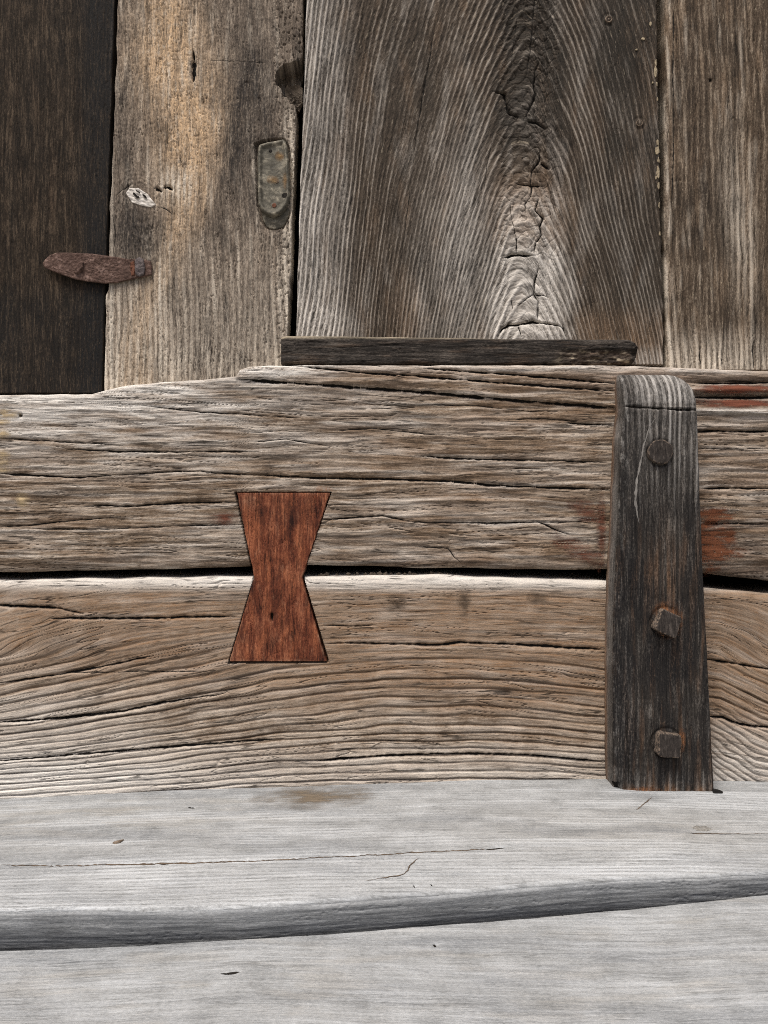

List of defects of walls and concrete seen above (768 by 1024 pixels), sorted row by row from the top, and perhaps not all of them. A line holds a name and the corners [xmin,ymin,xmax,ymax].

crack [495,1,549,130]
crack [497,155,566,337]
rust [702,385,768,407]
rust [700,509,740,572]
crack [12,848,503,881]